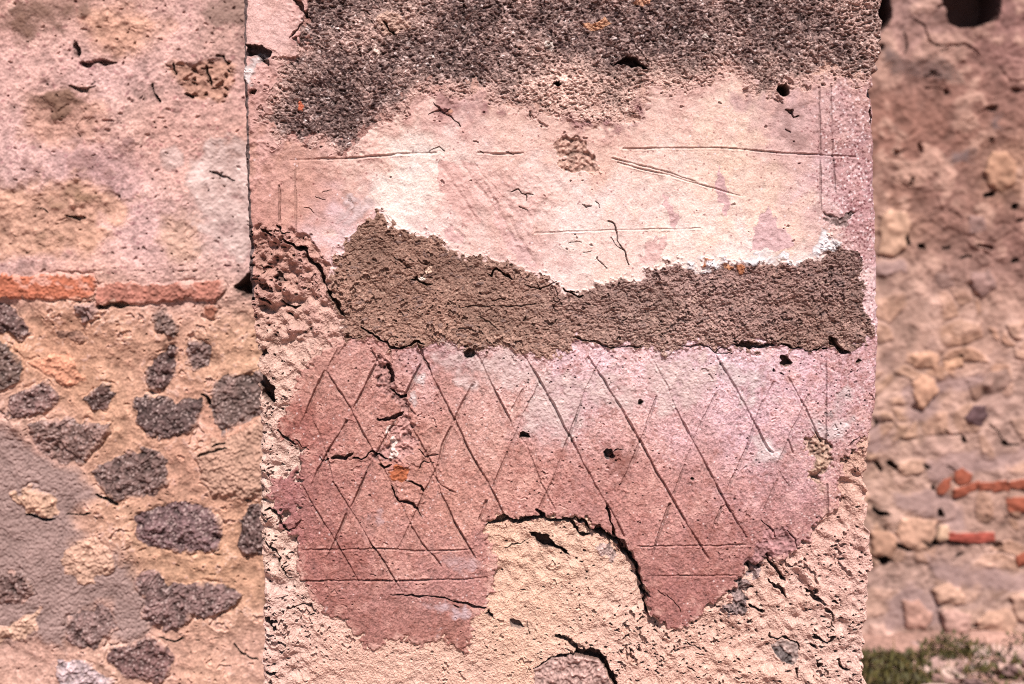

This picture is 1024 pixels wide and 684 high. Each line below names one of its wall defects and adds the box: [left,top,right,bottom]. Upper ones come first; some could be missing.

spalling [257,0,882,176]
peeling [437,159,537,267]
peeling [639,193,680,266]
peeling [715,165,731,216]
peeling [703,206,795,274]
spalling [823,211,854,228]
crack [261,225,433,369]
spalling [250,224,873,684]
crack [494,505,681,613]
crack [533,634,578,669]